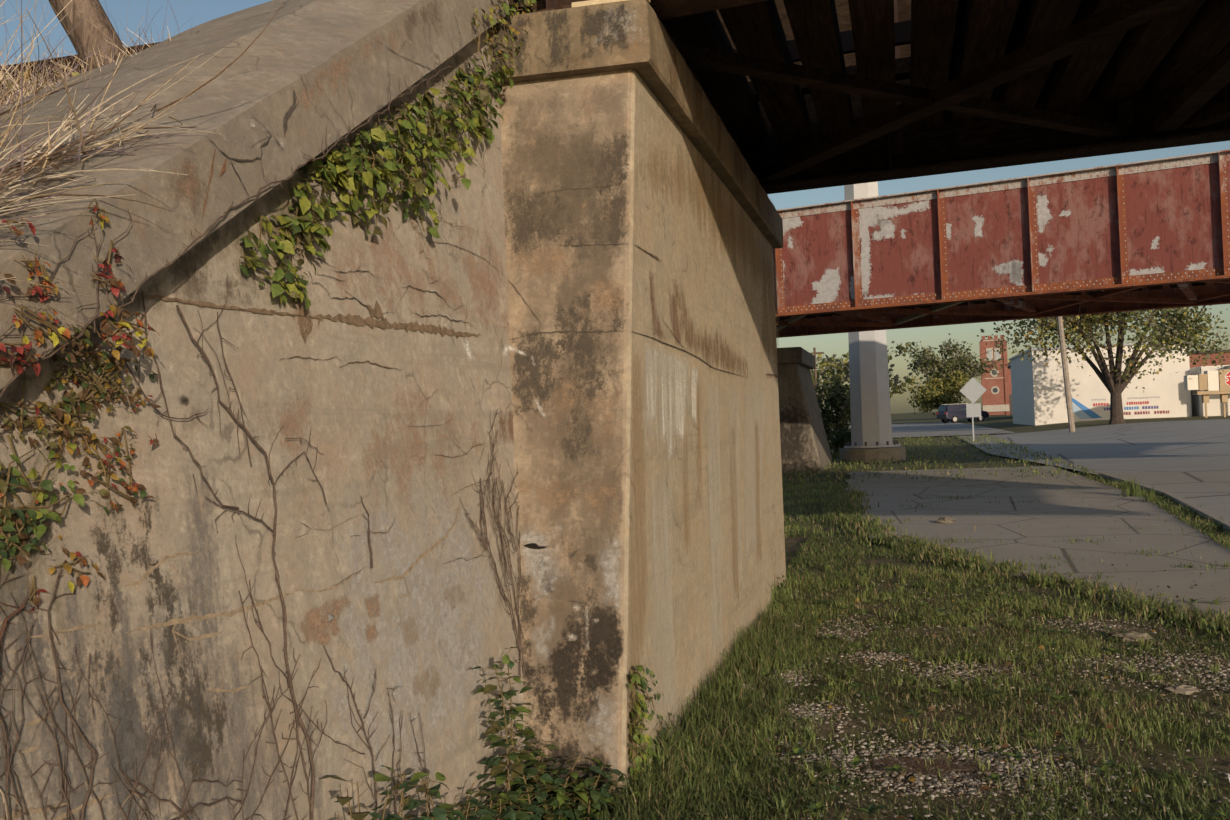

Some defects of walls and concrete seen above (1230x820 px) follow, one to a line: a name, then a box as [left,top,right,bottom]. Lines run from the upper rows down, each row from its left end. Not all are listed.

crack [131,219,778,377]
peeling [782,217,804,280]
peeling [811,200,929,304]
peeling [972,215,985,237]
peeling [991,259,1024,286]
peeling [1036,195,1072,266]
peeling [1129,266,1165,276]
damp [504,294,623,459]
damp [646,350,698,457]
damp [520,532,553,625]
damp [75,501,260,820]
damp [522,551,622,794]